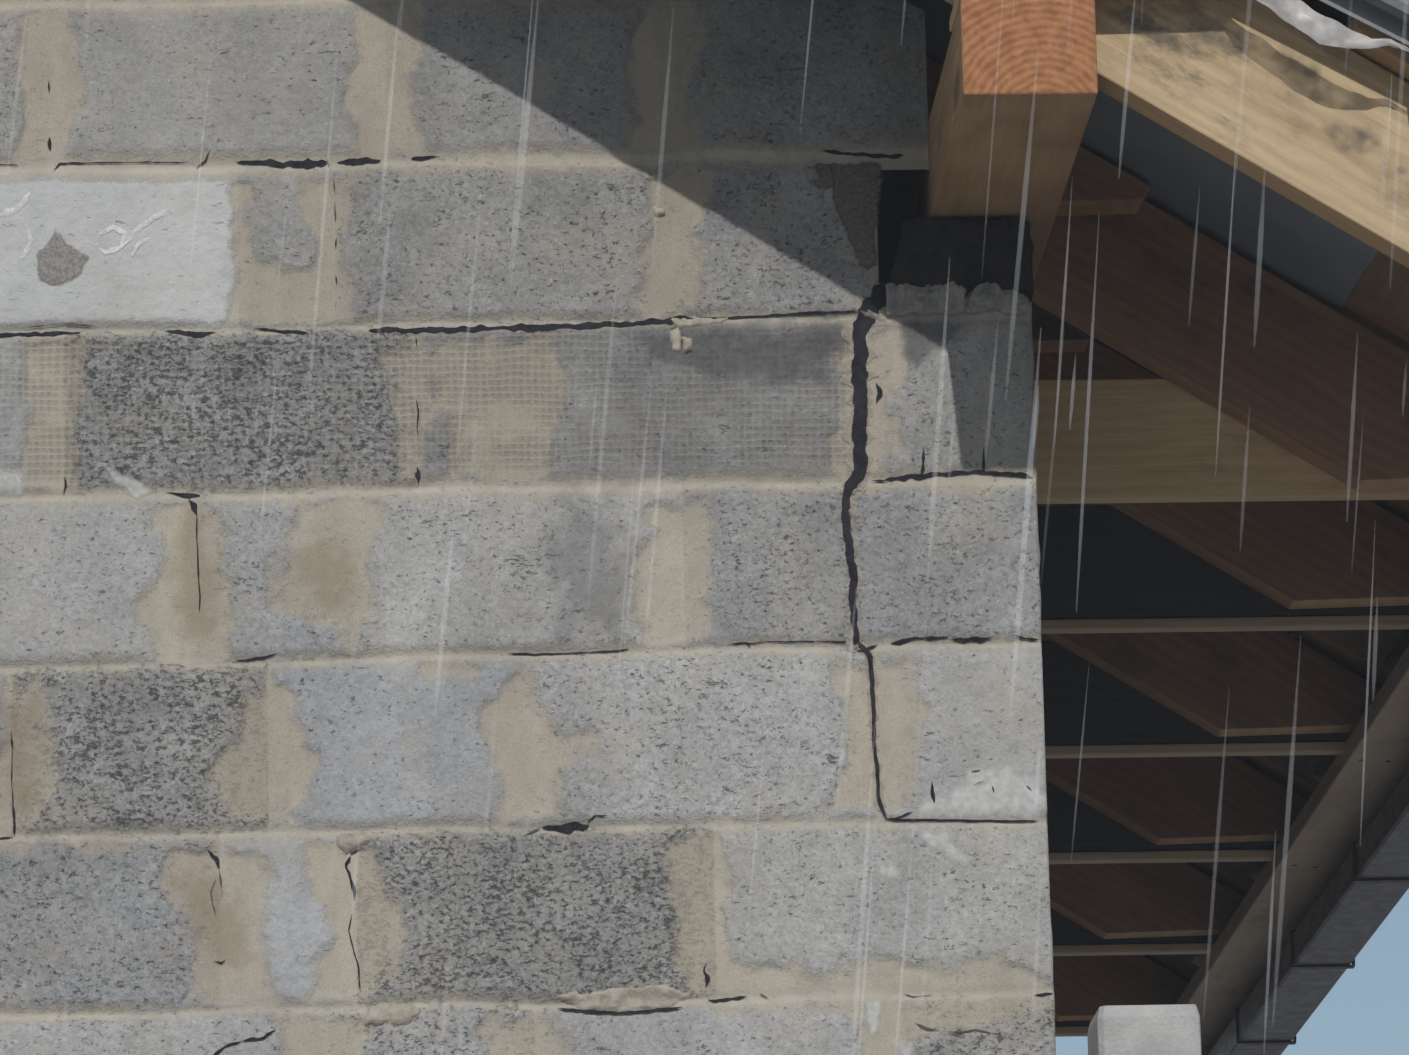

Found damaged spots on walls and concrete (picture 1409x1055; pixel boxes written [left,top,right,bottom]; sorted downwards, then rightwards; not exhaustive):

crack [54,150,210,170]
spalling [885,281,1029,315]
crack [166,492,201,610]
crack [838,283,1037,822]
crack [345,848,362,988]
crack [213,1030,275,1055]